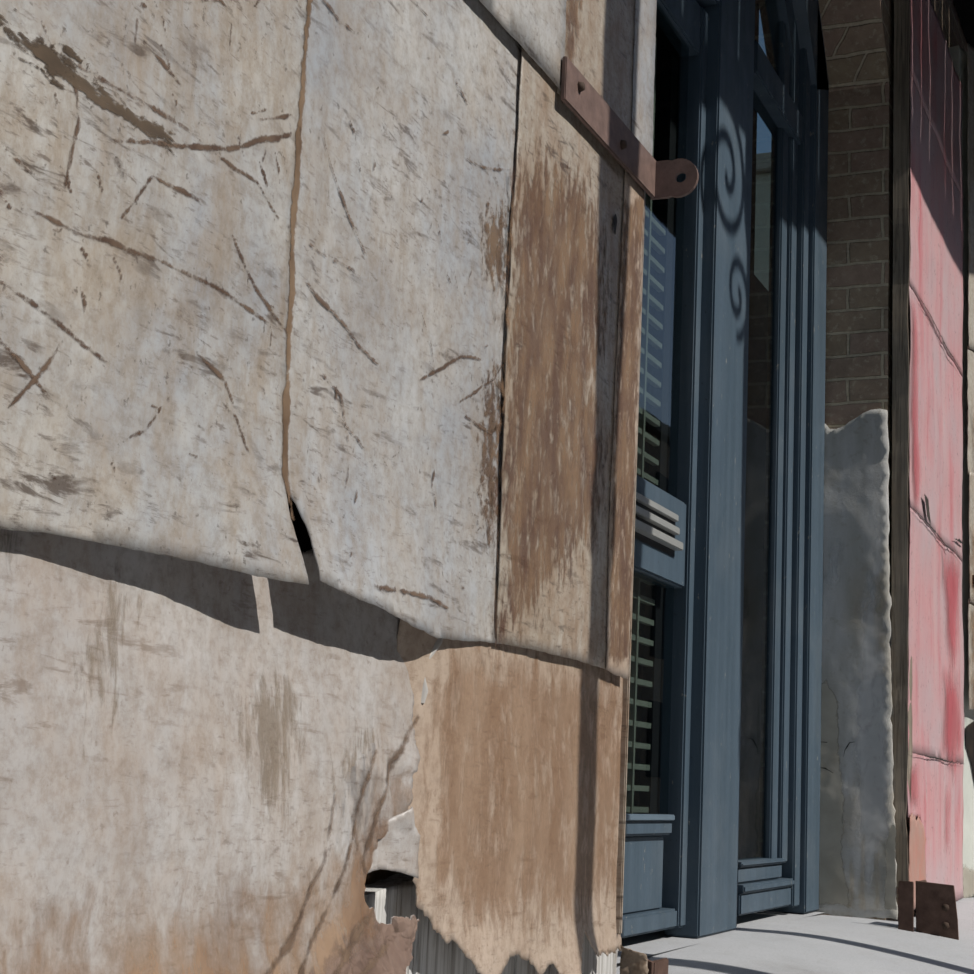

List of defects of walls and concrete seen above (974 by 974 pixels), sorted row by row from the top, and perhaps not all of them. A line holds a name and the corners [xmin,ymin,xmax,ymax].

rust [0,15,176,155]
rust [477,142,644,661]